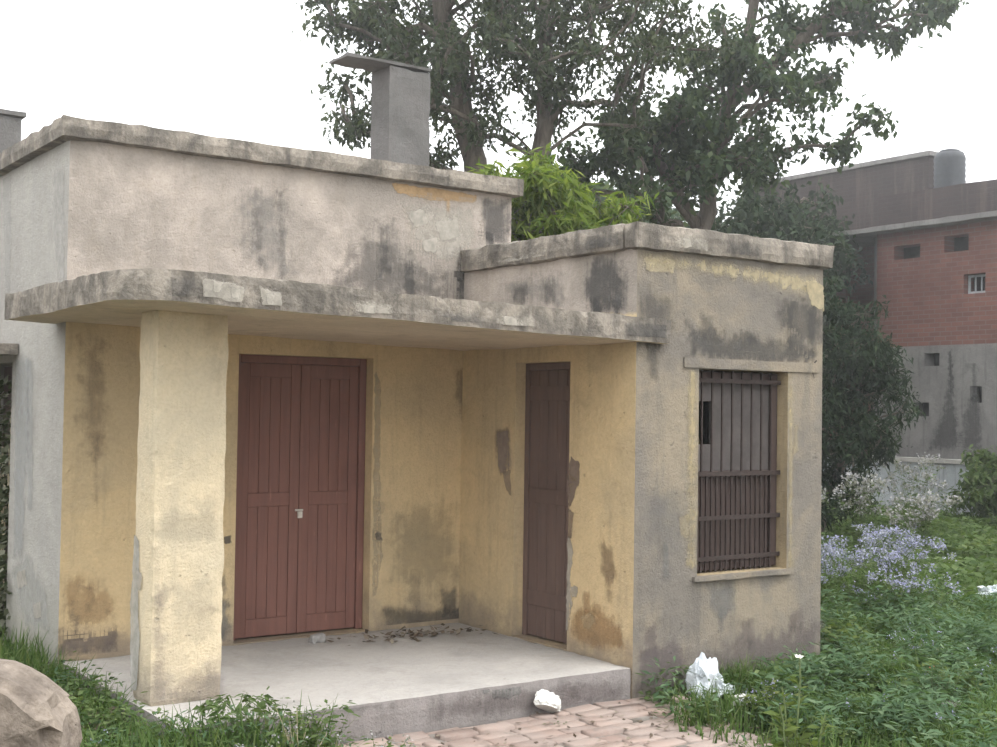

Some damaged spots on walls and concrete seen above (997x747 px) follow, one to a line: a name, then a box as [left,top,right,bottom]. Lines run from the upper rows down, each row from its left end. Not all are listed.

water stain [483,199,511,245]
water stain [261,288,282,306]
water stain [444,262,464,299]
water stain [586,239,627,314]
water stain [628,324,665,338]
water stain [692,331,815,363]
spalling [496,429,510,474]
spalling [566,457,580,630]
water stain [386,611,457,624]